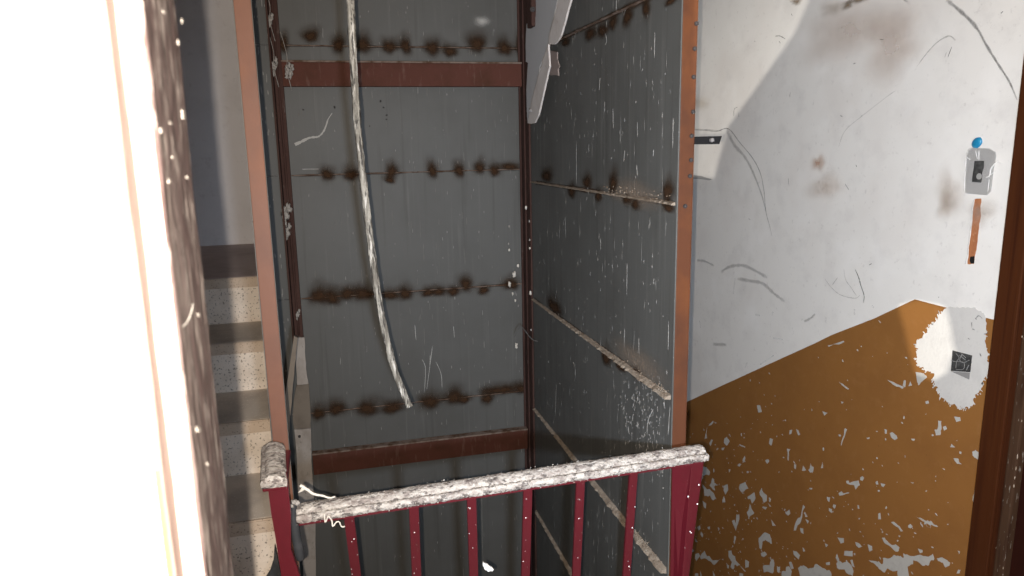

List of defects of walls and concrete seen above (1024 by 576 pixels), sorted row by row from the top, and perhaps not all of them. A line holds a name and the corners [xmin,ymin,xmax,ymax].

rust [551,0,649,45]
rust [305,31,518,56]
rust [309,169,359,179]
rust [380,164,397,183]
rust [476,162,517,176]
rust [536,172,649,209]
rust [664,184,672,212]
crack [693,173,712,181]
rust [312,278,516,303]
peeling [888,307,990,436]
rust [313,385,524,418]
peeling [692,421,960,576]